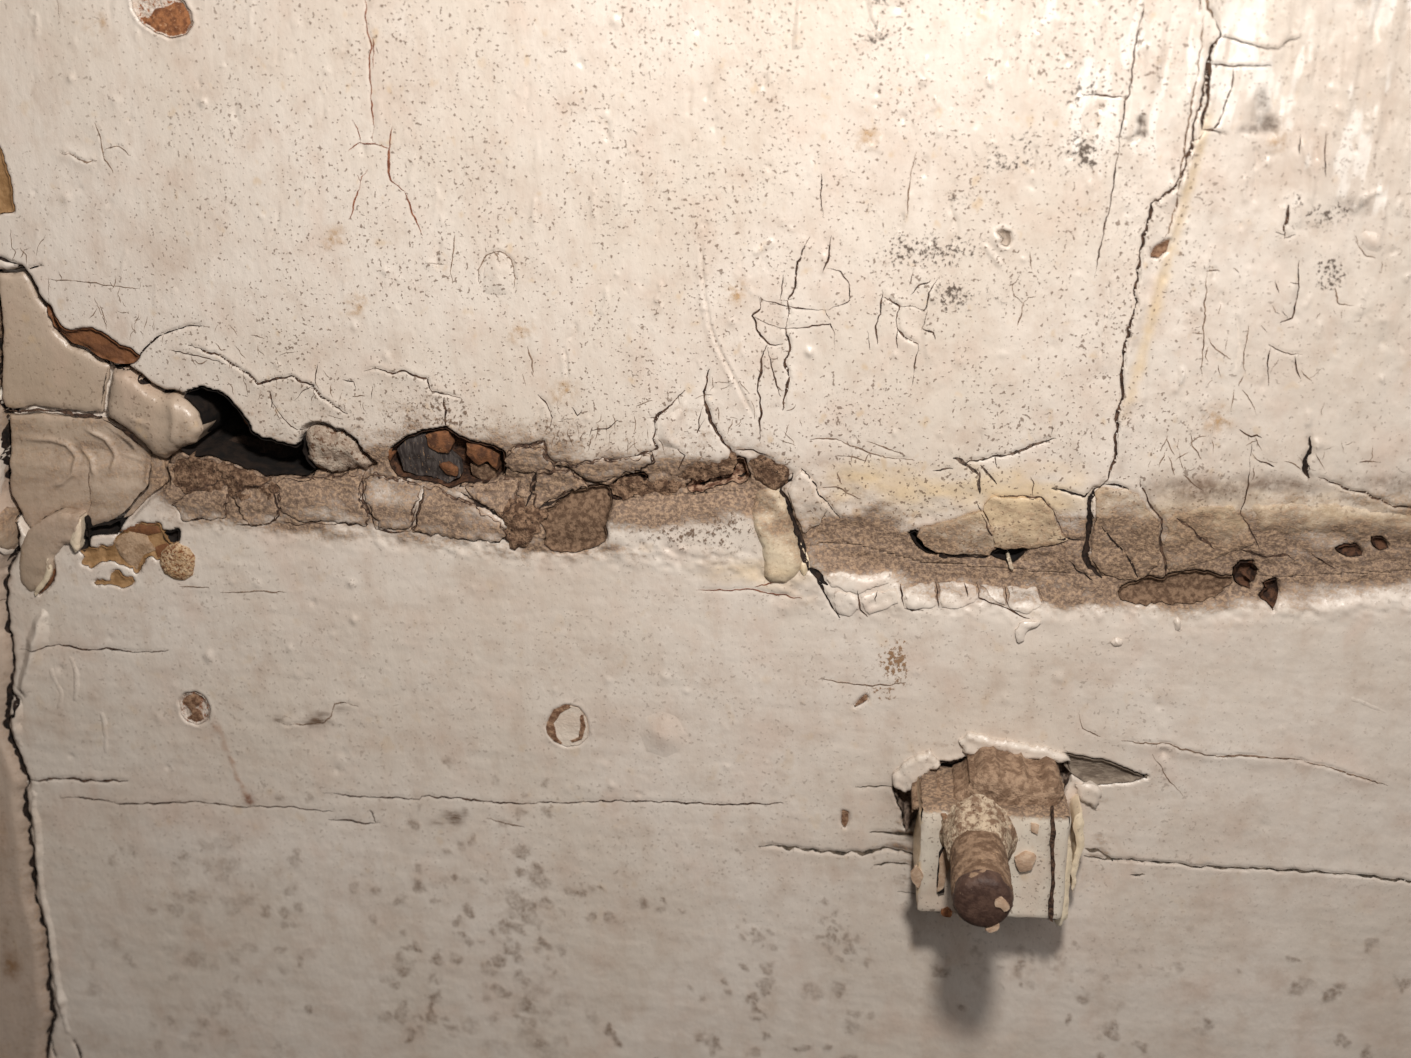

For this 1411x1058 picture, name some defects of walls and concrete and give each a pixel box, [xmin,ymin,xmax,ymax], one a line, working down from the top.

crack [349,1,516,286]
peeling [47,303,140,364]
crack [461,0,1411,619]
peeling [70,511,173,588]
peeling [541,471,648,552]
peeling [827,570,1042,643]
peeling [1118,560,1278,610]
spalling [1335,535,1389,556]
crack [0,233,782,1058]
crack [1132,741,1386,793]
crack [758,831,945,894]
crack [1048,805,1411,922]